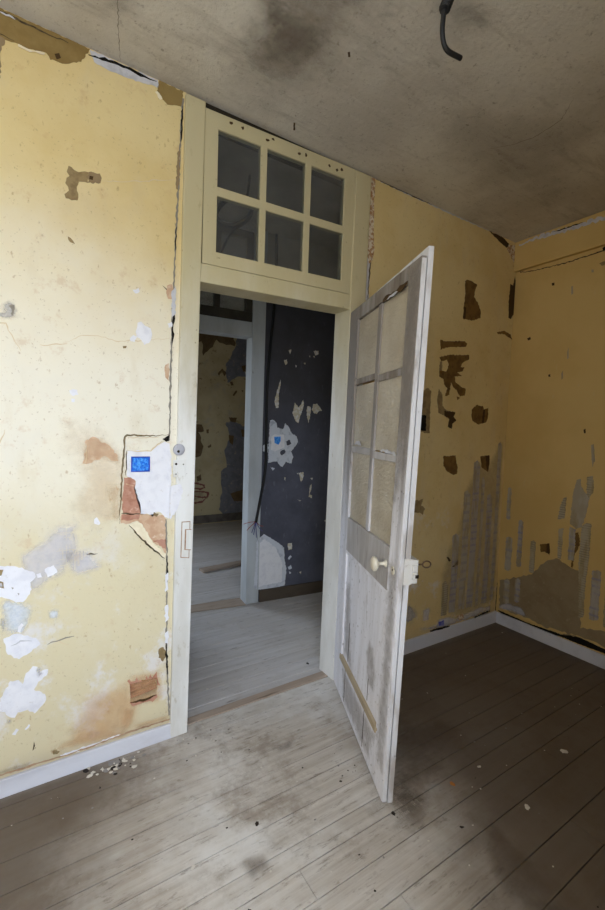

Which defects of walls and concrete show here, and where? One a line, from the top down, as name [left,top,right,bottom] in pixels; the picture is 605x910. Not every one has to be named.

peeling [0,8,90,73]
peeling [65,166,102,200]
crack [42,98,184,524]
peeling [463,280,481,321]
peeling [420,340,469,433]
peeling [471,405,488,425]
peeling [443,455,458,475]
peeling [480,455,490,472]
peeling [120,451,167,559]
peeling [499,532,605,648]
spalling [128,672,160,706]